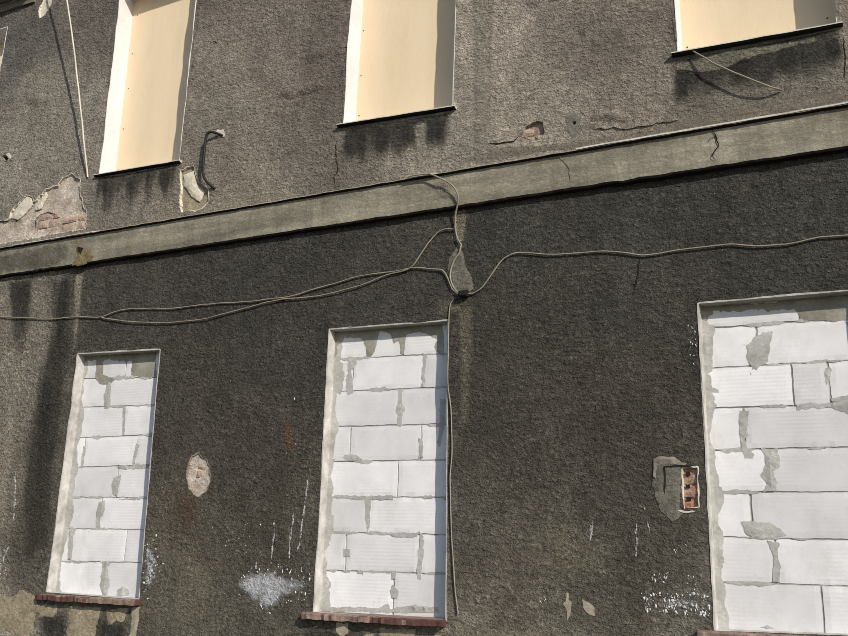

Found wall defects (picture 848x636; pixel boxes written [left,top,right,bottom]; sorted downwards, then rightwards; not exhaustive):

flaking render [38,0,52,18]
damp [675,30,841,91]
damp [344,114,447,163]
flaking render [469,120,609,161]
flaking render [0,173,87,244]
damp [97,165,176,202]
flaking render [179,165,210,213]
damp [10,281,31,332]
damp [27,275,82,554]
flaking render [186,452,211,497]
flaking render [0,590,58,636]
flaking render [66,606,140,636]